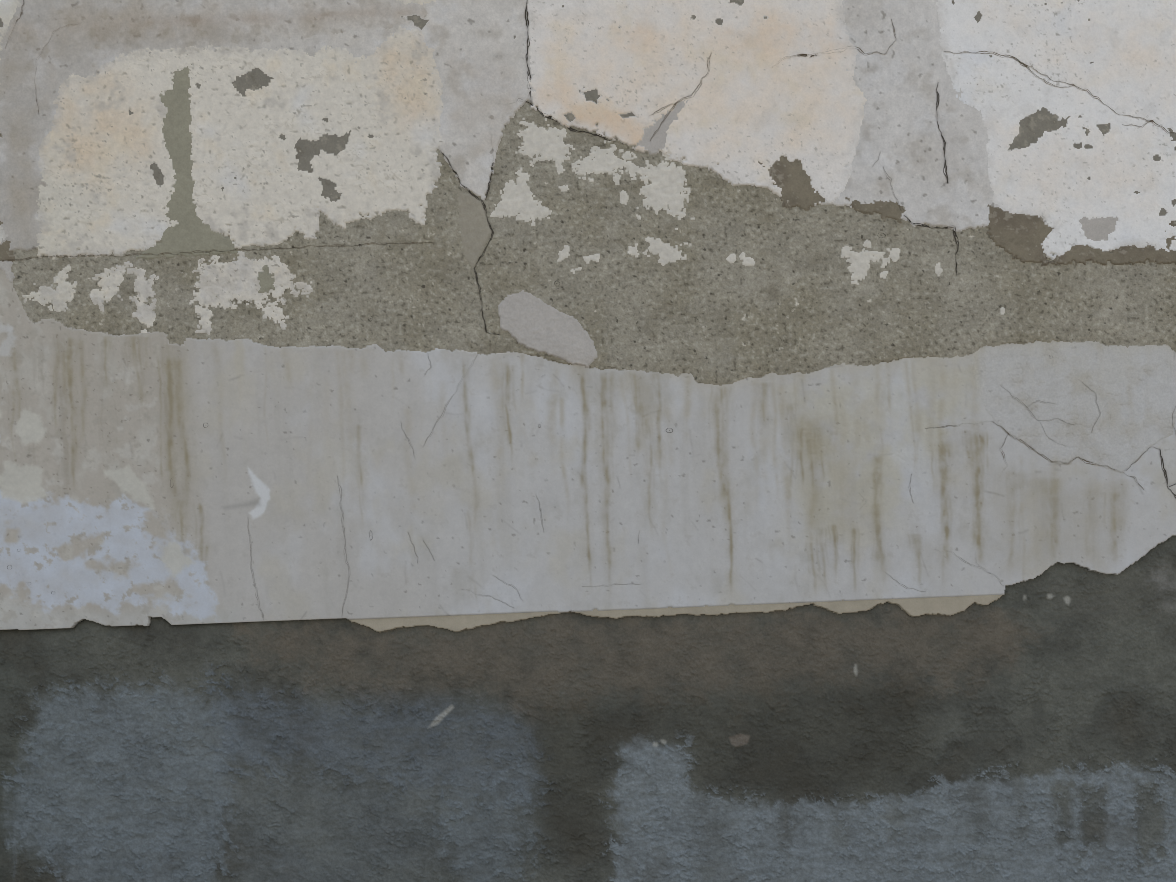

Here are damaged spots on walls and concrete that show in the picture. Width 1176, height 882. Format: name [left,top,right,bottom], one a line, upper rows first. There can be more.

flaking render [0,64,1176,386]
crack [936,86,948,183]
crack [944,51,1175,134]
leakage [448,350,522,612]
flaking render [0,404,1060,731]
leakage [562,364,674,604]
leakage [689,372,1176,617]
crack [936,386,1176,498]